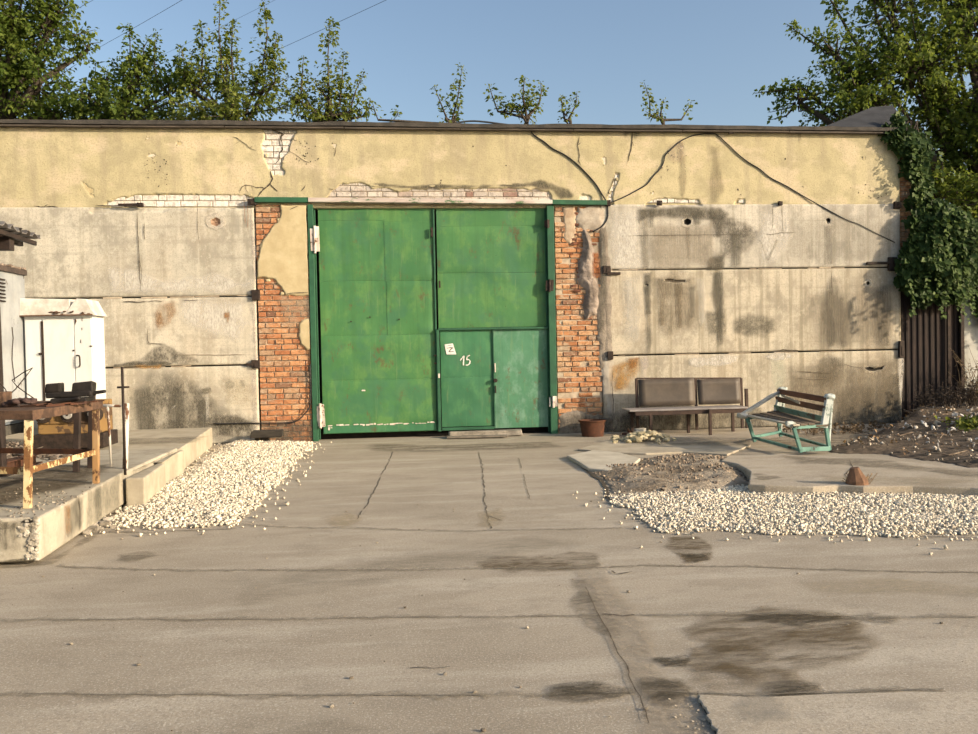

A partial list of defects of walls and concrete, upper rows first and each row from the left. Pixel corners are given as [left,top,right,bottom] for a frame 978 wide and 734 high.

crack [239,129,309,209]
spalling [262,130,319,175]
spalling [328,180,551,200]
peeling [257,205,309,297]
water stain [600,207,788,343]
peeling [298,318,310,351]
rust [613,358,639,388]
spalling [17,515,40,561]